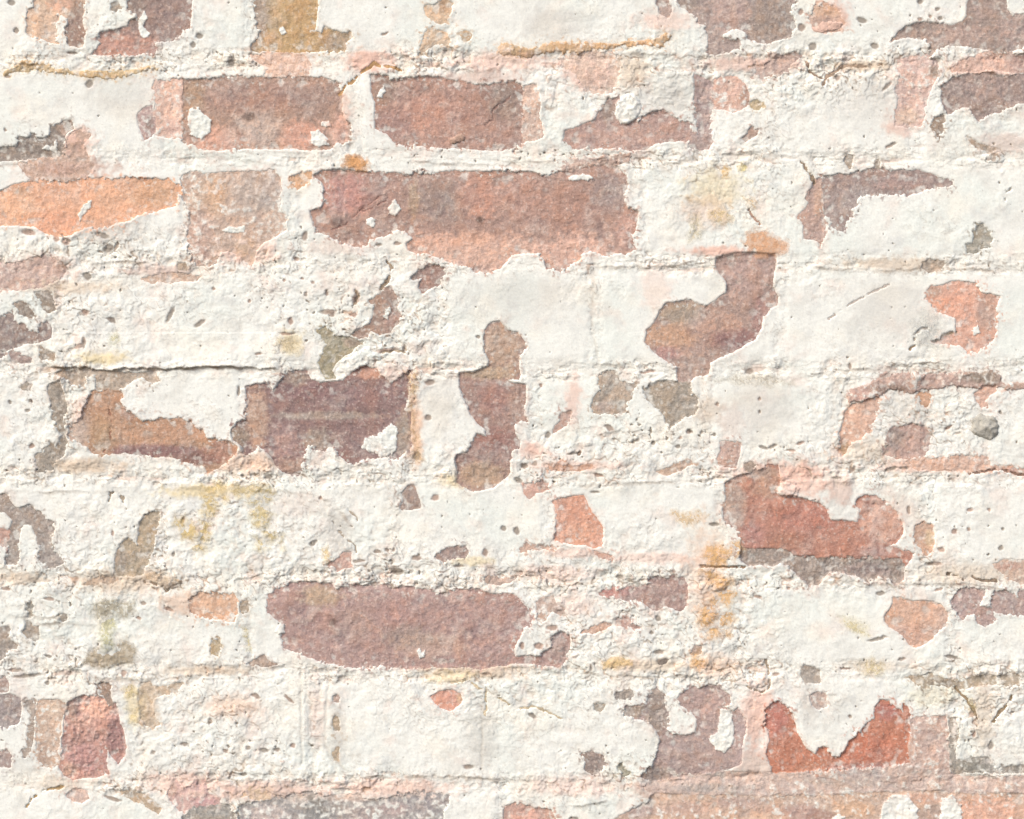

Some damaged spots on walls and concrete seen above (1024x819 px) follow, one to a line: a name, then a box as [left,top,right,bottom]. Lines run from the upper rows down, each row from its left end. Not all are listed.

peeling [137,75,351,151]
peeling [370,74,544,153]
peeling [554,47,765,153]
peeling [0,165,638,294]
peeling [797,155,953,246]
peeling [0,254,412,476]
peeling [456,321,528,492]
peeling [591,253,778,428]
spalling [717,440,935,586]
peeling [267,572,640,670]
peeling [0,676,127,803]
peeling [580,685,1024,819]